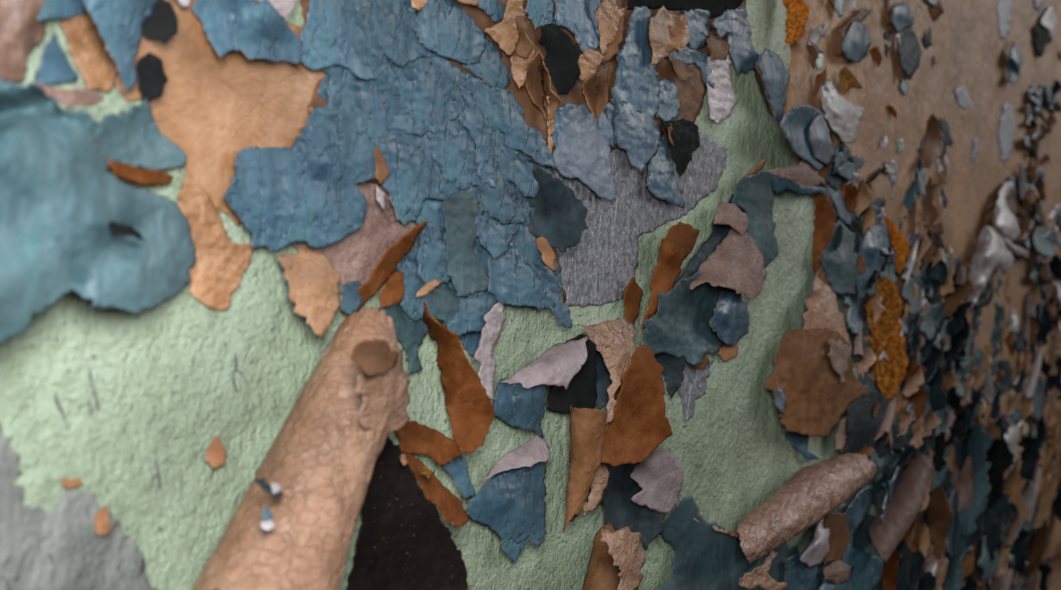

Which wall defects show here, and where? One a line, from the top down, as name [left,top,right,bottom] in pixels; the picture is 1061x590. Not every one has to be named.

peeling [782,0,810,49]
peeling [806,22,828,71]
peeling [829,0,934,96]
peeling [917,0,945,21]
peeling [995,0,1013,39]
peeling [1033,0,1061,61]
peeling [582,48,1061,590]
corrosion [865,216,910,399]